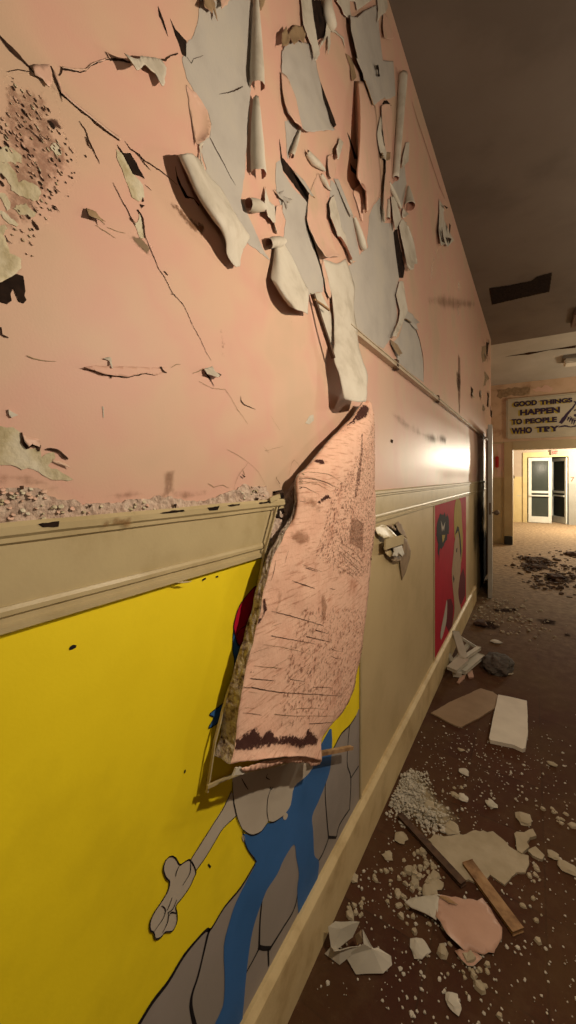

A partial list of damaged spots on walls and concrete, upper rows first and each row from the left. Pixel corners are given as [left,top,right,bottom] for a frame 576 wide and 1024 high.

crack [158,7,187,61]
spalling [0,64,87,282]
crack [0,35,210,358]
peeling [178,0,424,402]
spalling [0,410,295,561]
spalling [375,522,411,579]